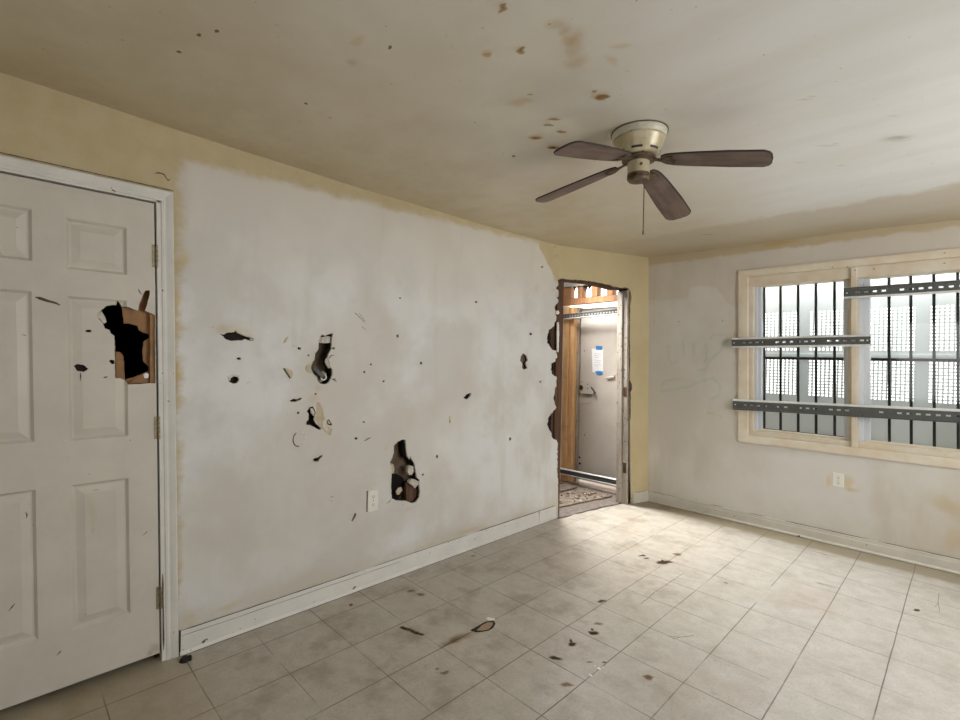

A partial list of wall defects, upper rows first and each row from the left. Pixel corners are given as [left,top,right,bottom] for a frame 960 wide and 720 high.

spalling [297,333,335,436]
spalling [546,279,632,518]
spalling [390,439,424,504]